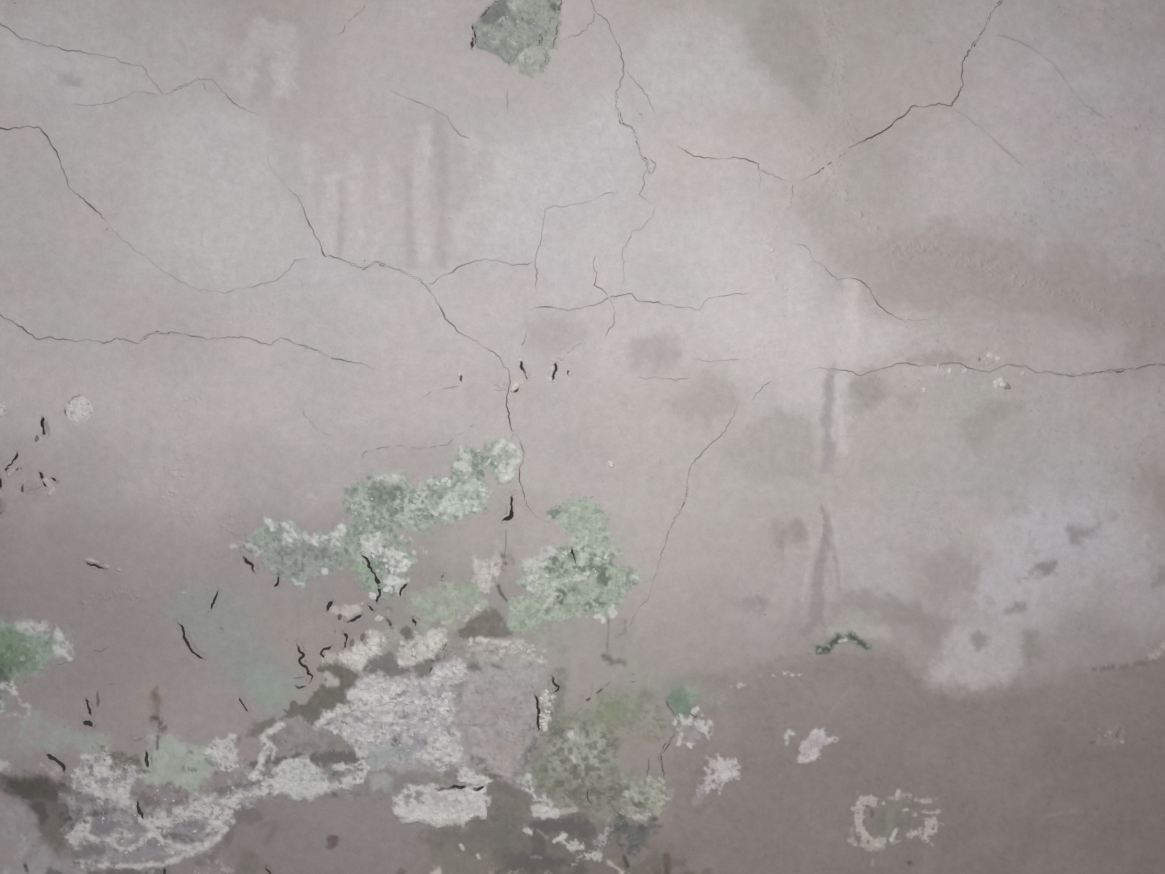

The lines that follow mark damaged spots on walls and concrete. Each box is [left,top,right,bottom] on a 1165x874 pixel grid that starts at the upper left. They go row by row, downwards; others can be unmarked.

flaking render [455,0,564,89]
crack [0,0,1109,567]
peeling [35,413,50,442]
flaking render [63,393,94,423]
crack [802,361,1165,378]
peeling [0,451,60,520]
peeling [83,558,122,574]
water stain [0,177,1165,874]
crack [628,380,772,628]
peeling [316,581,411,664]
flaking render [448,653,556,791]